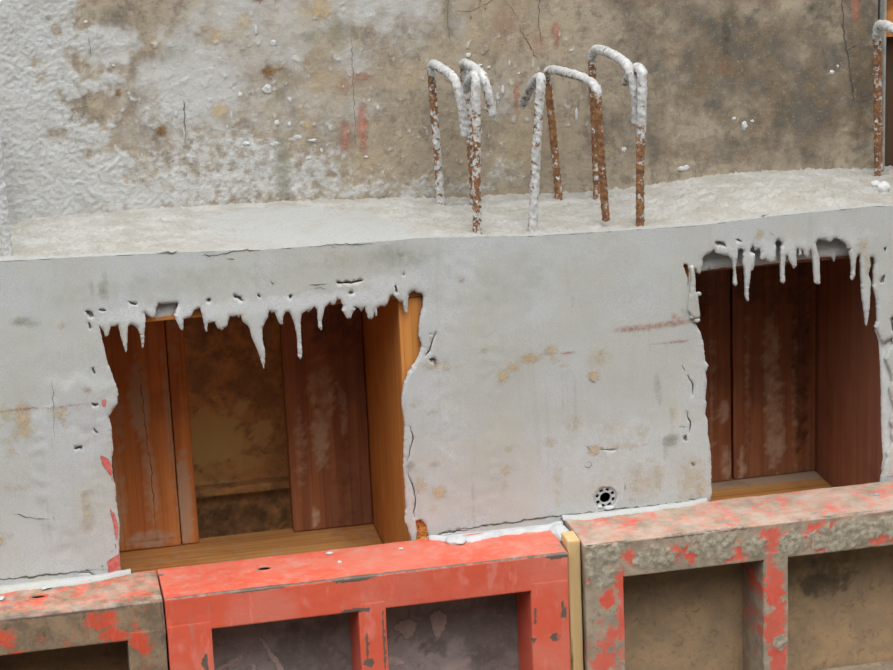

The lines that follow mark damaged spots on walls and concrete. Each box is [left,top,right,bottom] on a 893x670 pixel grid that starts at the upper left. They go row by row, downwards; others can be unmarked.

crack [447,0,541,59]
peeling [128,301,178,318]
peeling [683,238,849,323]
peeling [101,456,113,480]
peeling [102,509,120,573]
spalling [416,520,429,540]